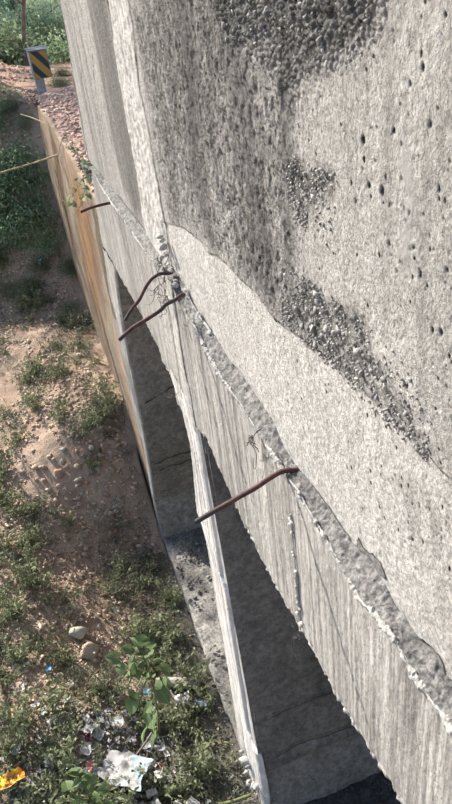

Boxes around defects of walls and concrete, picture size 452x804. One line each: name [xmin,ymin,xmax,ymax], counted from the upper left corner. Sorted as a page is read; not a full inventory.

crack [156,451,192,471]
spalling [312,485,386,580]